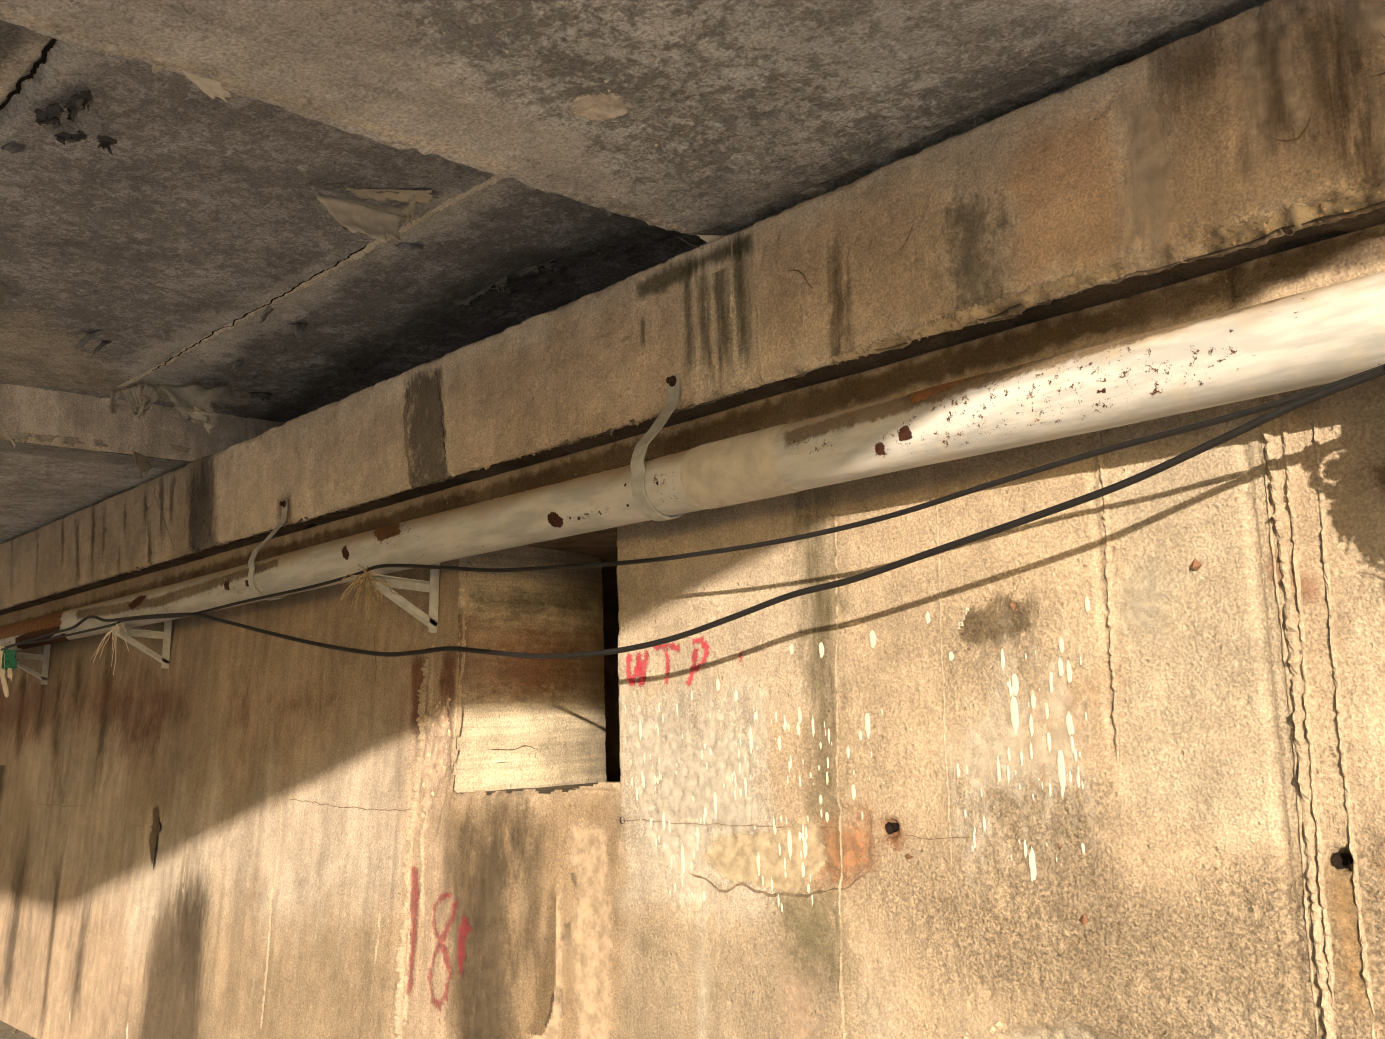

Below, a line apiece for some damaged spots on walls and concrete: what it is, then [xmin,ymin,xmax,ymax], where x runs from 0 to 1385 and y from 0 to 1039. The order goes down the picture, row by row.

peeling [0,141,26,154]
peeling [316,188,439,251]
spalling [1201,179,1385,253]
damp [685,244,745,363]
peeling [108,361,244,434]